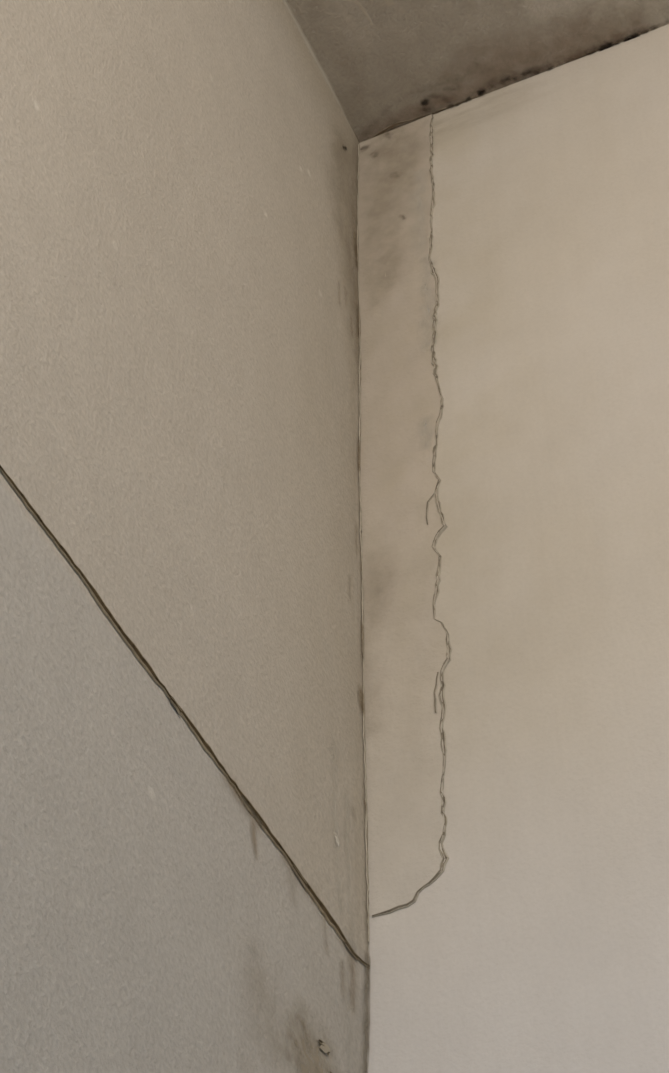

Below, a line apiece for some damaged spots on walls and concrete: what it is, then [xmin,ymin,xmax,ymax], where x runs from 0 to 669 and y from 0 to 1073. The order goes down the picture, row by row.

water stain [575,27,656,57]
crack [0,465,370,991]
crack [357,23,669,943]